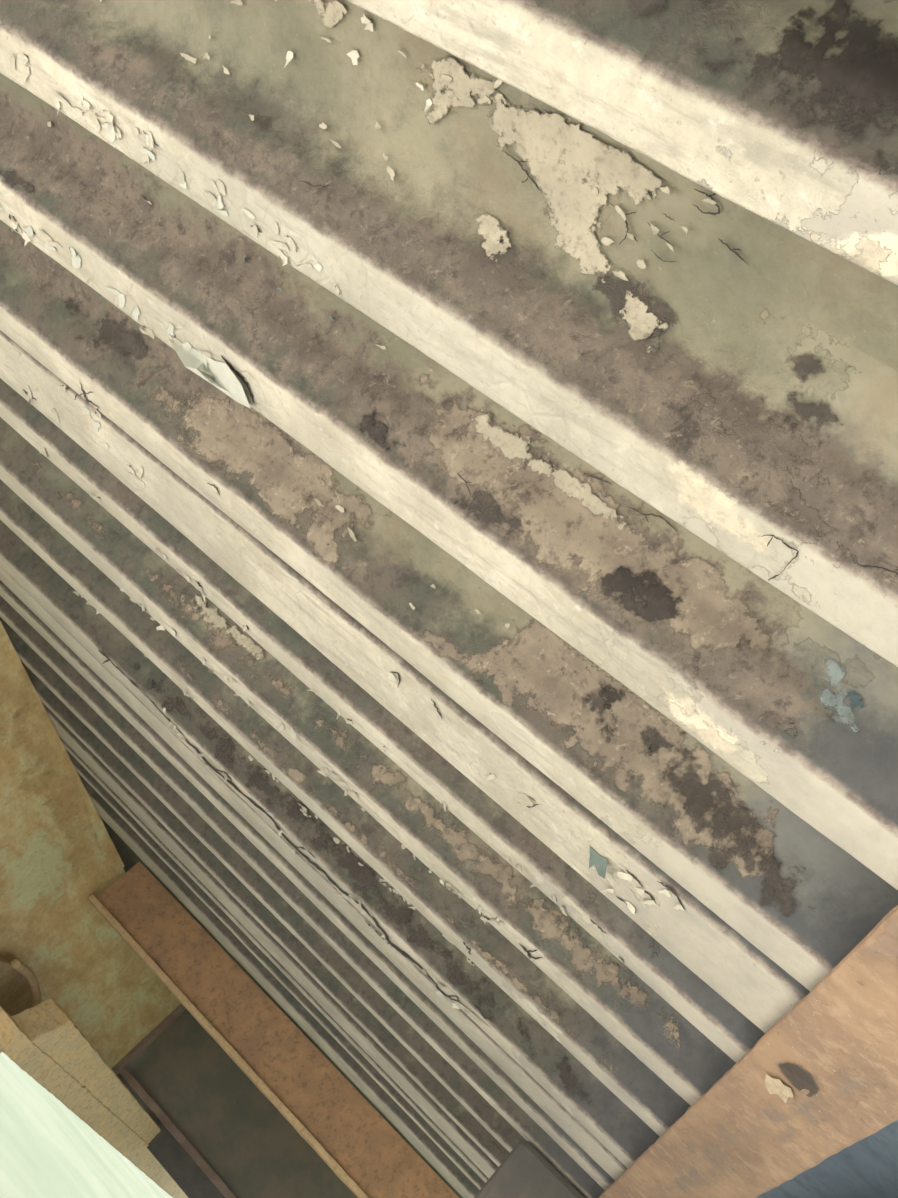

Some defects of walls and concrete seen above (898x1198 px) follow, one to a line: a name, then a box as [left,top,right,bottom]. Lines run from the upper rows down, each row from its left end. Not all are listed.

peeling [361,13,374,32]
peeling [347,50,360,65]
water stain [704,0,898,136]
peeling [416,56,670,353]
peeling [0,207,82,268]
peeling [105,287,255,409]
water stain [357,411,398,451]
crack [759,535,799,581]
water stain [600,566,682,622]
water stain [601,686,626,708]
crack [98,650,492,1026]
peeling [589,846,685,914]